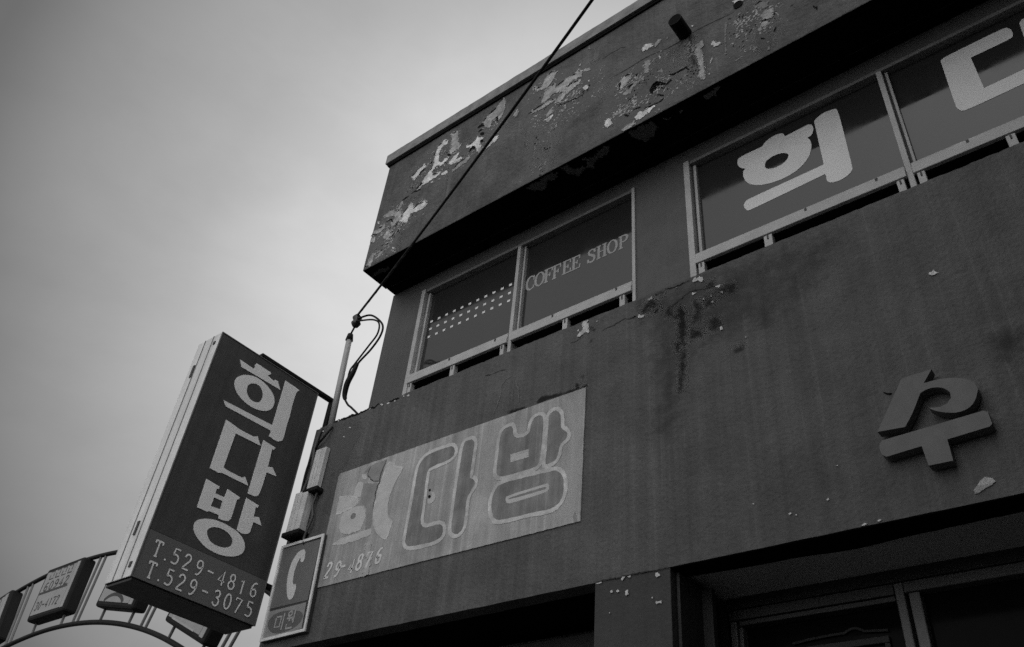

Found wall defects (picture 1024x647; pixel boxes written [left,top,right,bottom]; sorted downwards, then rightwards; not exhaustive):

peeling [365,0,793,267]
water stain [642,300,711,387]